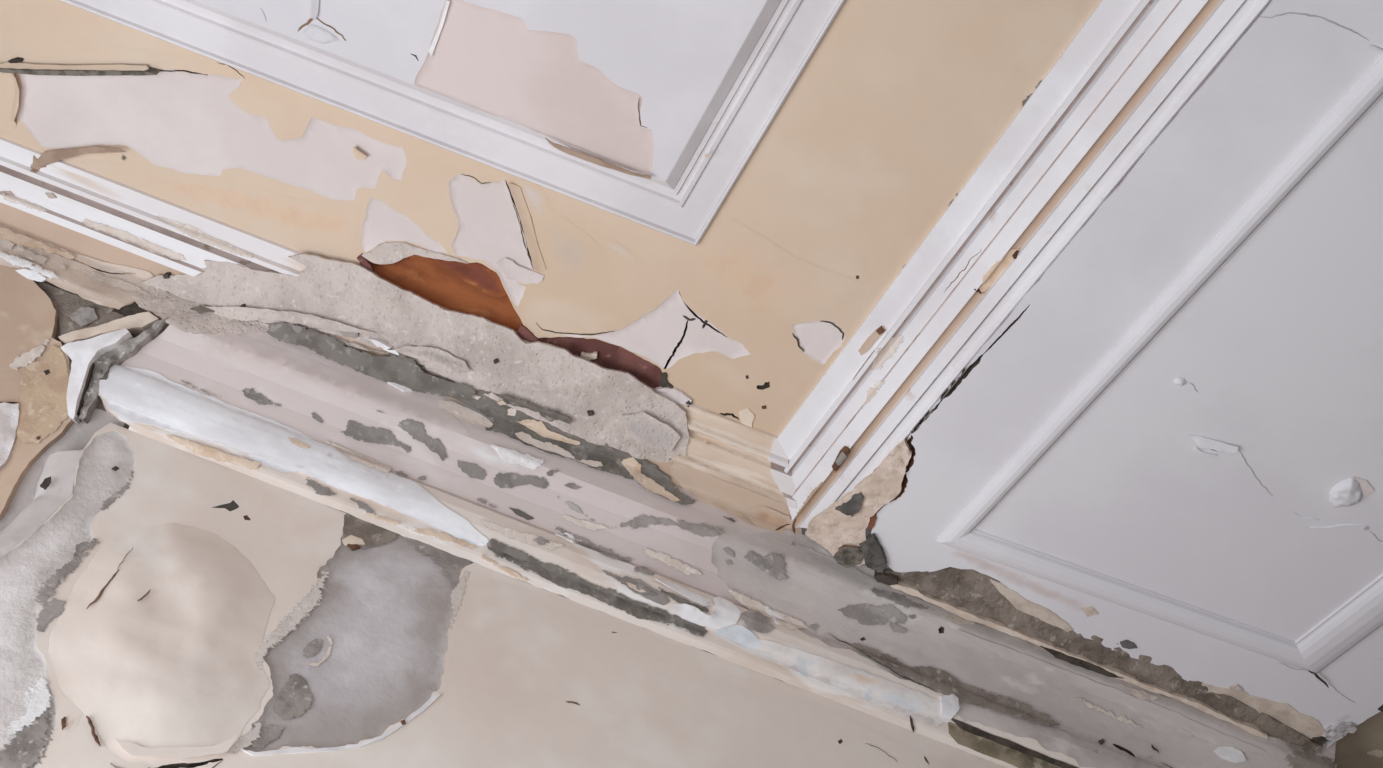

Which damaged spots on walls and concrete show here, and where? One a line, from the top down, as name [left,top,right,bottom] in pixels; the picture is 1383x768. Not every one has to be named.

peeling [0,57,406,201]
peeling [411,0,654,179]
crack [1259,12,1383,50]
spalling [0,174,1357,768]